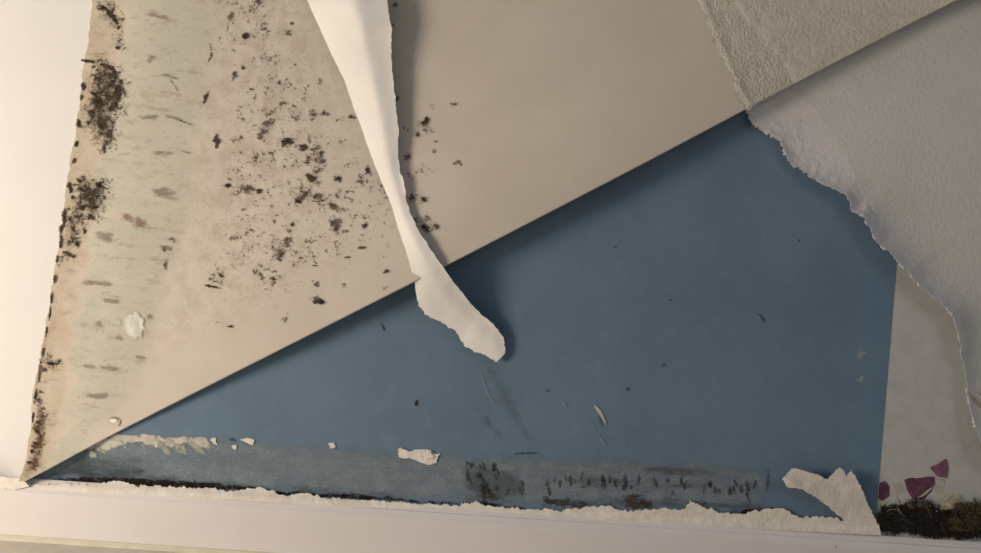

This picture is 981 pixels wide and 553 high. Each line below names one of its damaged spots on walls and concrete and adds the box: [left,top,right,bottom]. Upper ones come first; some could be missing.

leakage [27,172,114,474]
leakage [72,1,132,164]
peeling [0,0,421,490]
leakage [205,0,388,293]
peeling [387,0,956,267]
leakage [54,438,773,514]
leakage [875,494,981,542]